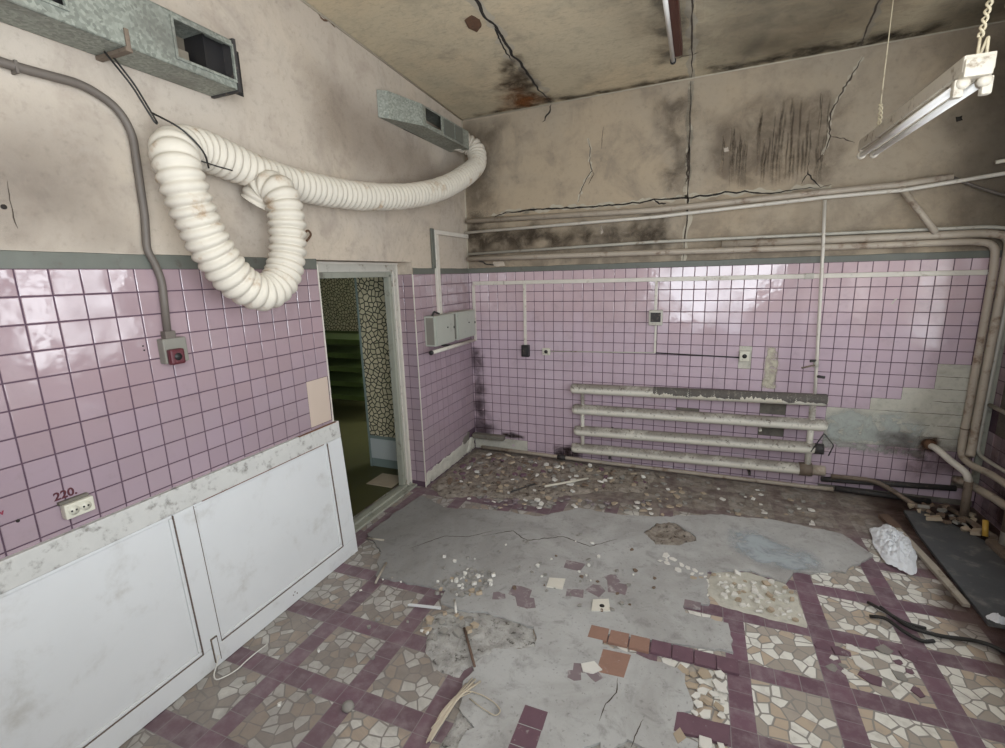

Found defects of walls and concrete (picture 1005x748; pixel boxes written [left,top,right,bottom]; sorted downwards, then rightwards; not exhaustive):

crack [465,0,555,122]
crack [492,0,884,261]
damp [468,223,592,252]
damp [632,226,665,241]
peeling [651,364,981,458]
spalling [426,432,528,485]
crack [412,531,615,548]
spalling [467,496,696,545]
spalling [424,611,535,678]
spalling [440,711,473,748]